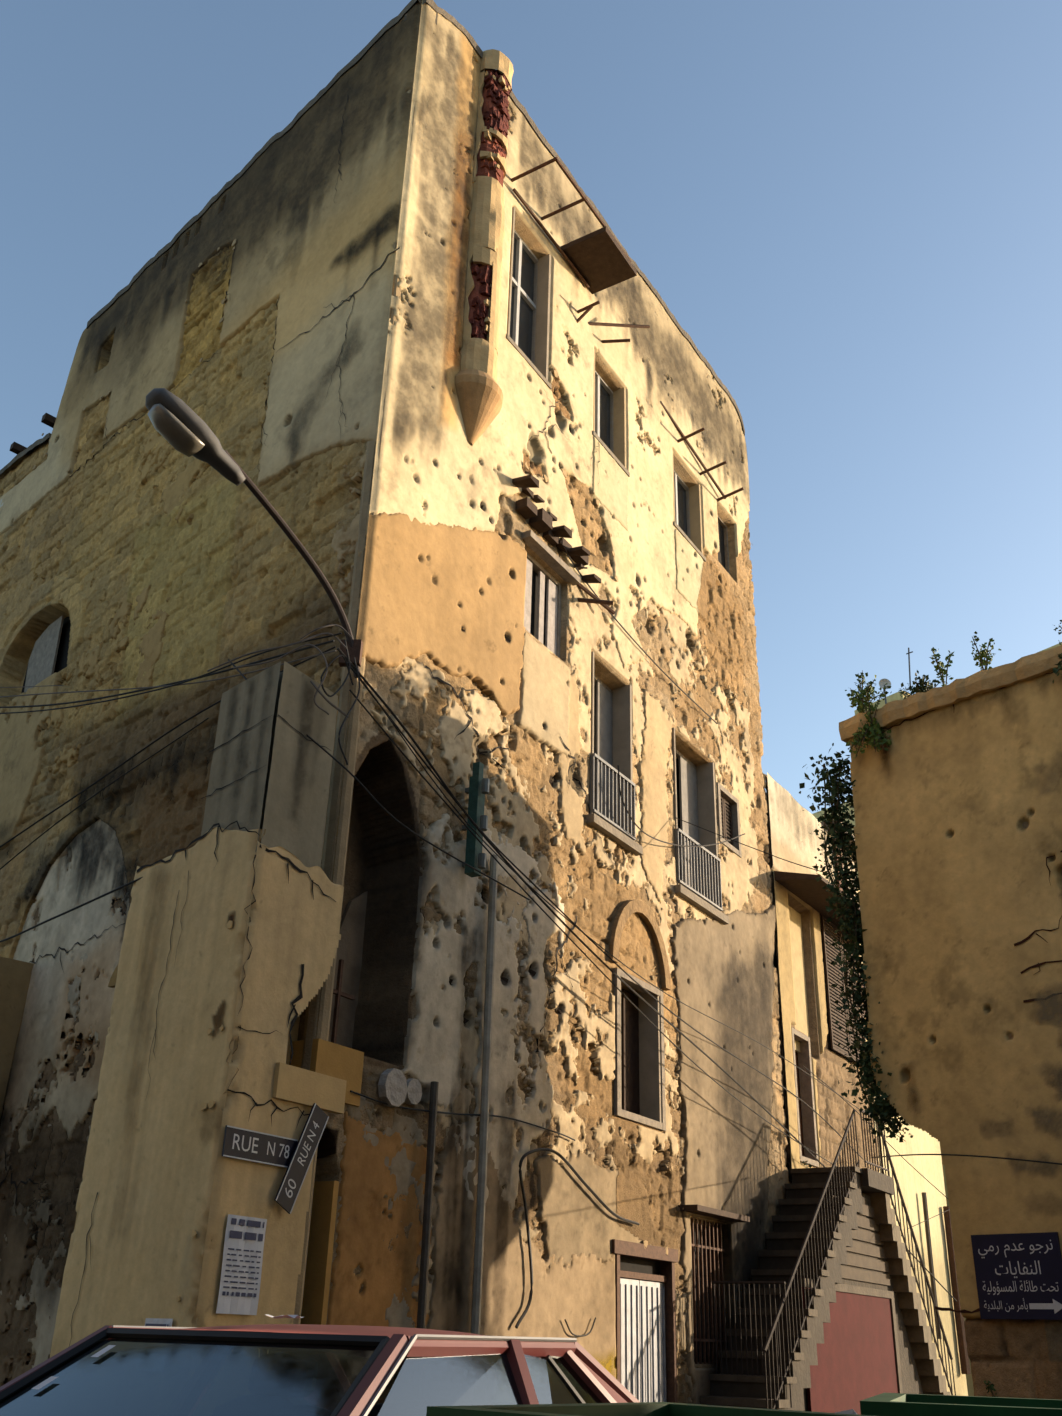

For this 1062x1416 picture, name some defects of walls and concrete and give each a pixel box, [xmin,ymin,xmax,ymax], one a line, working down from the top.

crack [258,247,400,472]
crack [209,715,331,752]
peeling [361,453,760,980]
crack [136,766,336,1128]
peeling [437,930,685,1255]
crack [1014,850,1062,1003]
peeling [1037,991,1062,1025]
peeling [0,1072,67,1368]
crack [69,1192,98,1346]
peeling [345,1096,438,1329]
peeling [675,1283,693,1404]